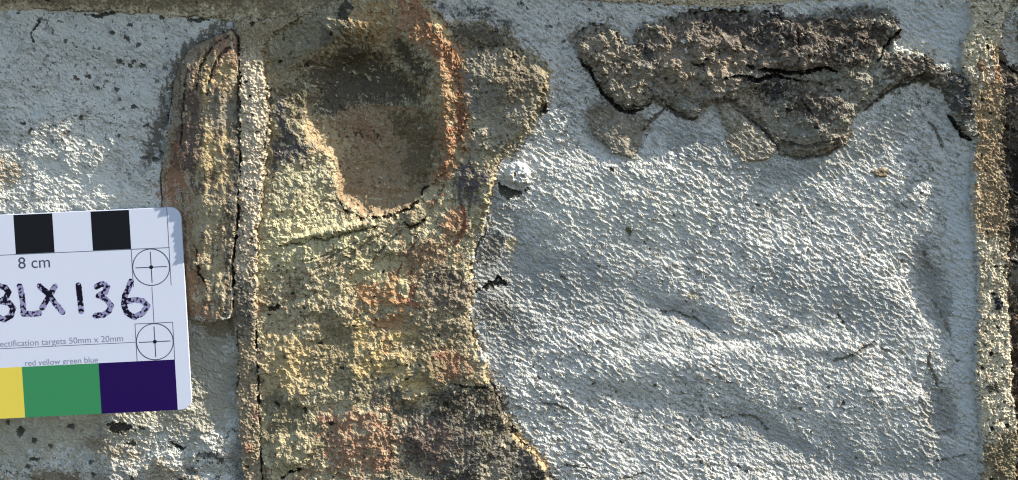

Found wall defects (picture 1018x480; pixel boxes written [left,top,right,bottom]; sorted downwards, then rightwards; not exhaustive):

peeling [405,206,427,225]
spalling [433,0,1010,480]
crack [833,313,893,362]
peeling [271,430,313,476]